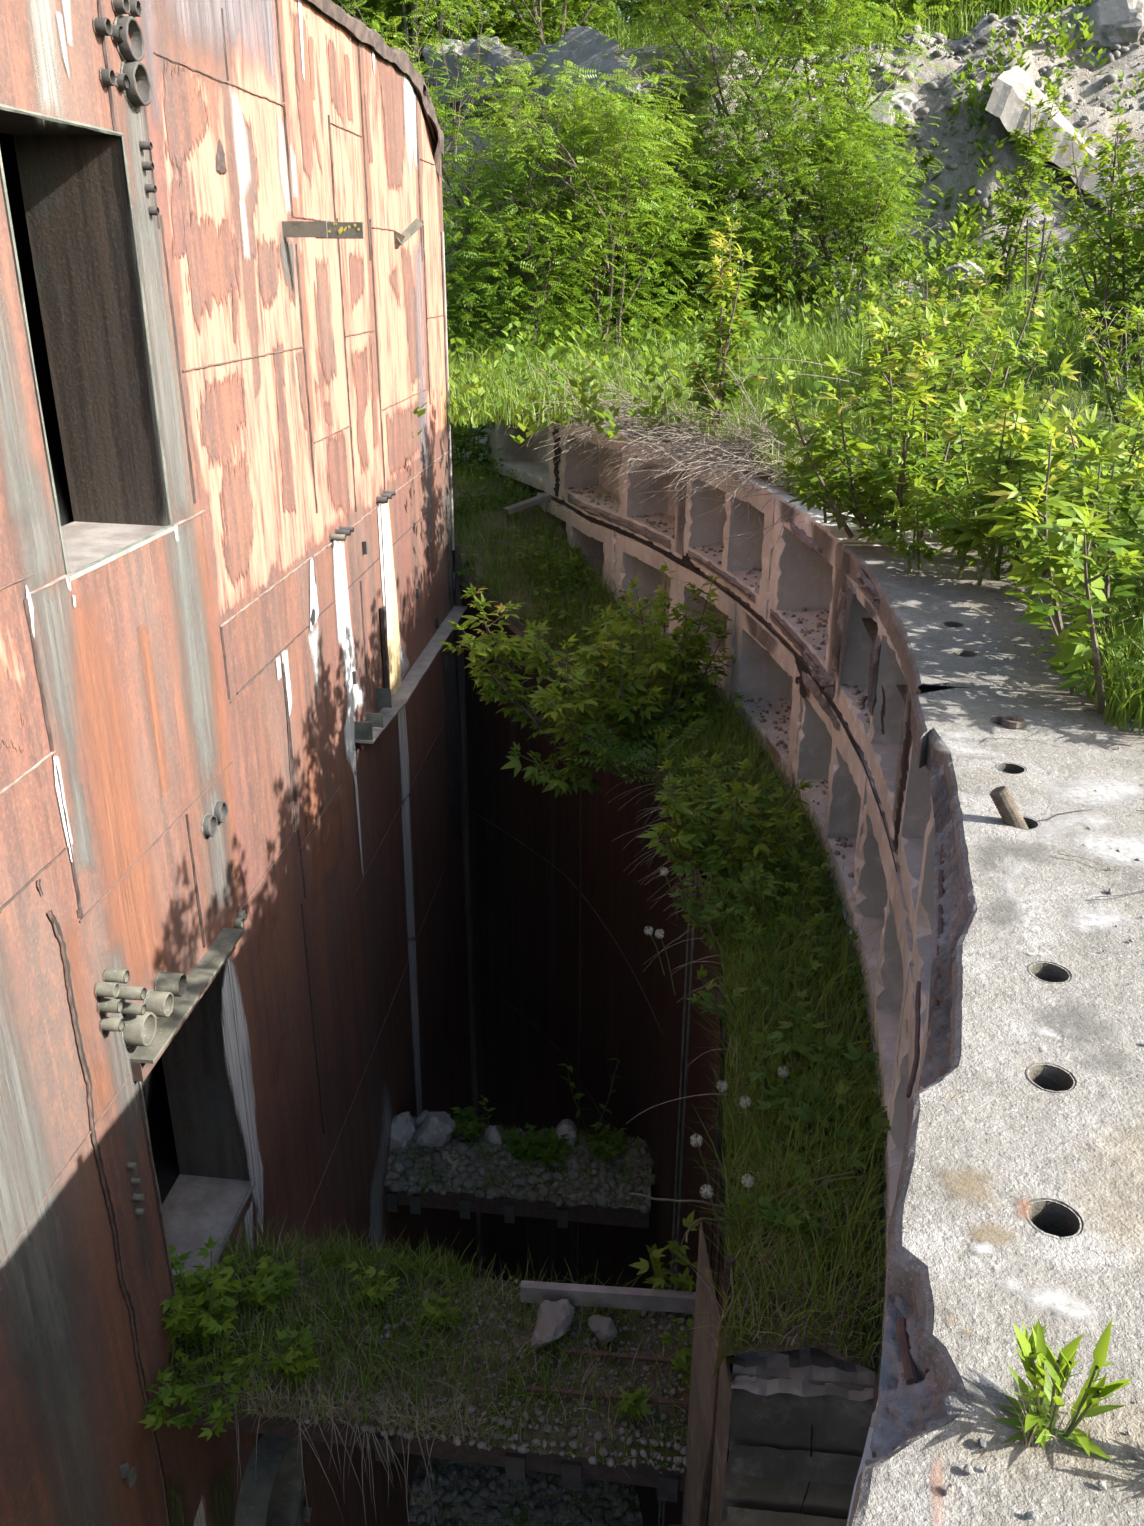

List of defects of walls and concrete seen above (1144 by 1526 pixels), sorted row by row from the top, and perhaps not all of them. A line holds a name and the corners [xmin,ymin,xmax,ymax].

rust [216,140,227,175]
peeling [161,58,297,344]
peeling [292,10,406,194]
damp [127,0,228,903]
peeling [197,368,256,591]
peeling [273,245,422,519]
damp [276,651,292,716]
damp [310,559,319,685]
damp [333,541,364,877]
crack [795,661,806,699]
crack [881,682,951,852]
spalling [906,737,977,1098]